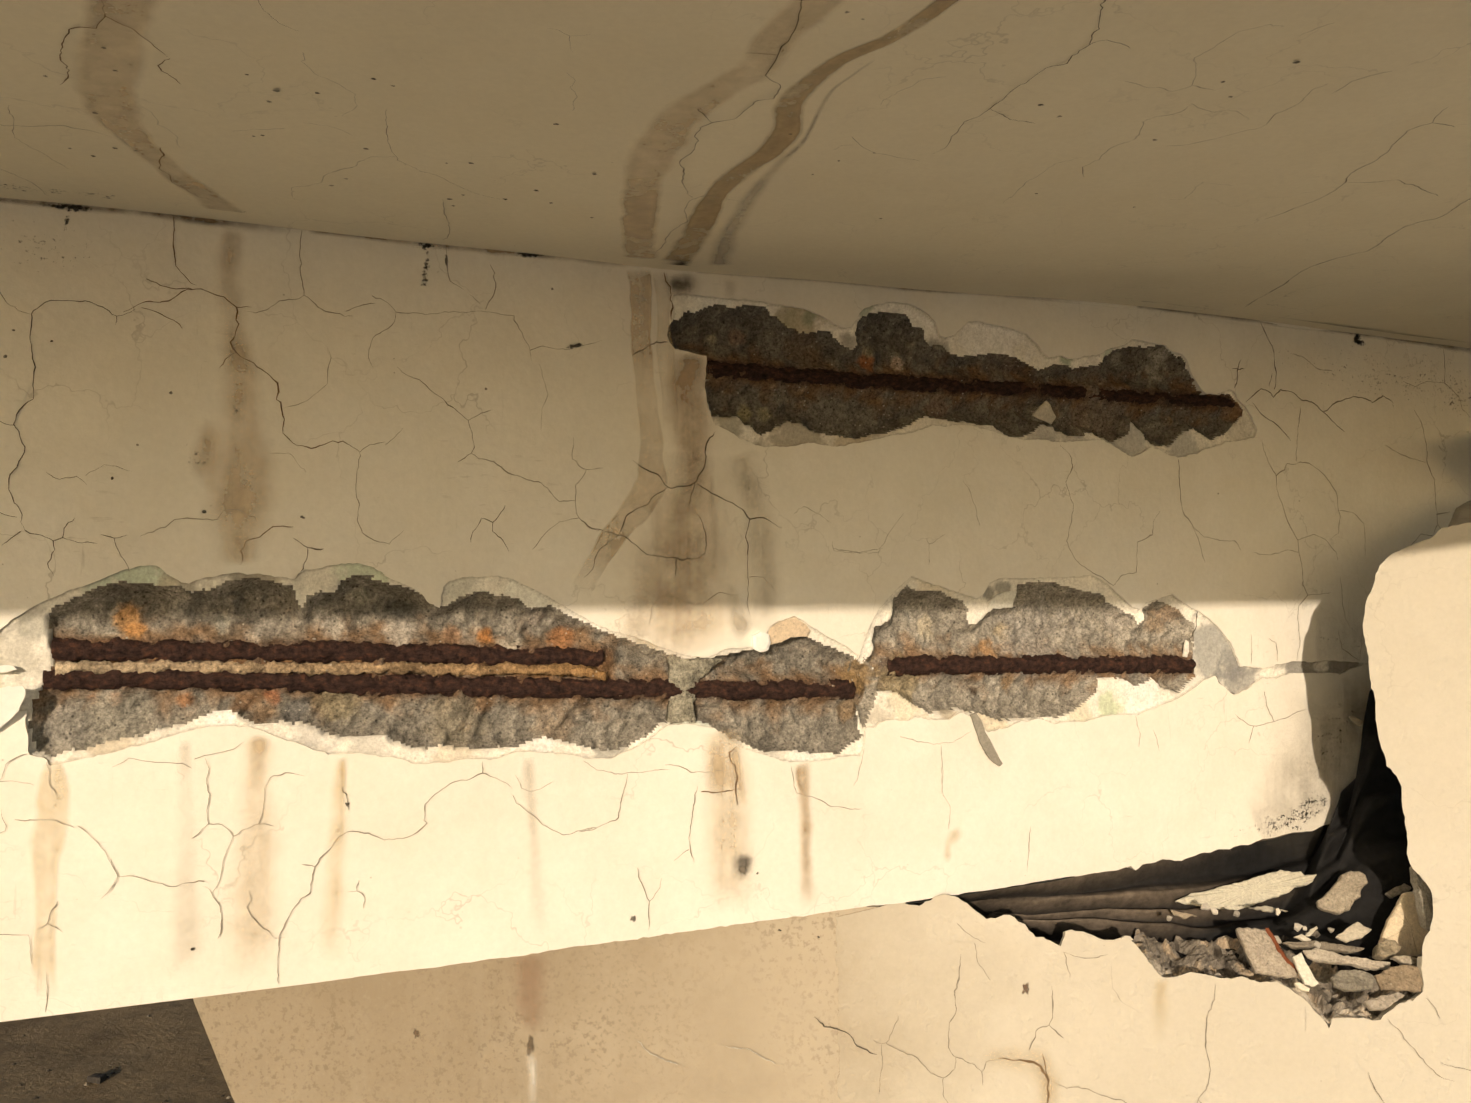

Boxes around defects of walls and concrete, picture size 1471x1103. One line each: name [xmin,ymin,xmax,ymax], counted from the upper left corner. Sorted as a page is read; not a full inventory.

water stain [623,0,958,340]
crack [0,0,902,625]
spalling [667,293,1255,457]
rust [706,360,1235,408]
crack [1013,109,1471,741]
rust [43,636,856,701]
spalling [0,563,1369,766]
rust [886,653,1196,677]
crack [0,745,738,984]
crack [815,923,1138,1103]
crack [1197,985,1216,1103]
spalling [1133,928,1417,1024]